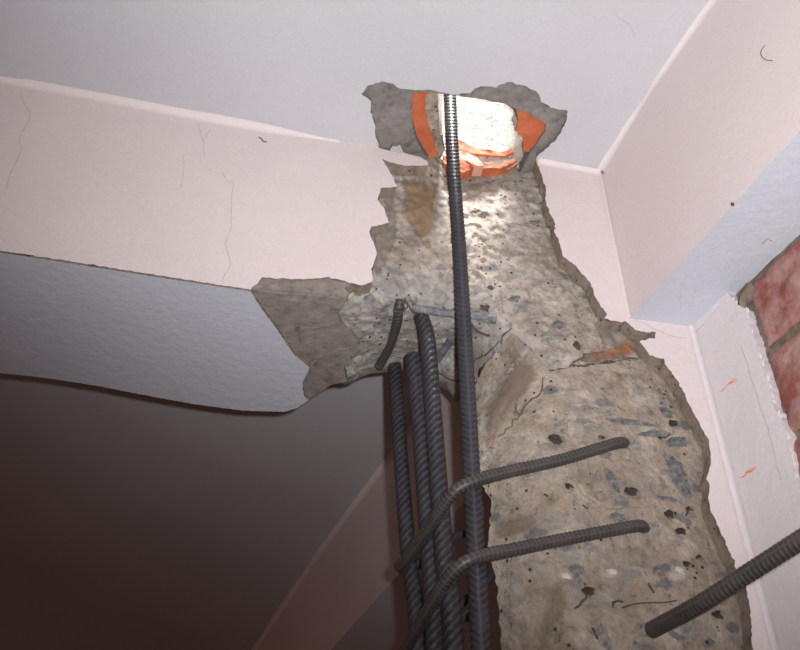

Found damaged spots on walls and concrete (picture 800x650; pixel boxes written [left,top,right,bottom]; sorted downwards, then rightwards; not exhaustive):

damp [404,181,435,248]
spalling [252,81,743,650]
crack [498,378,543,437]